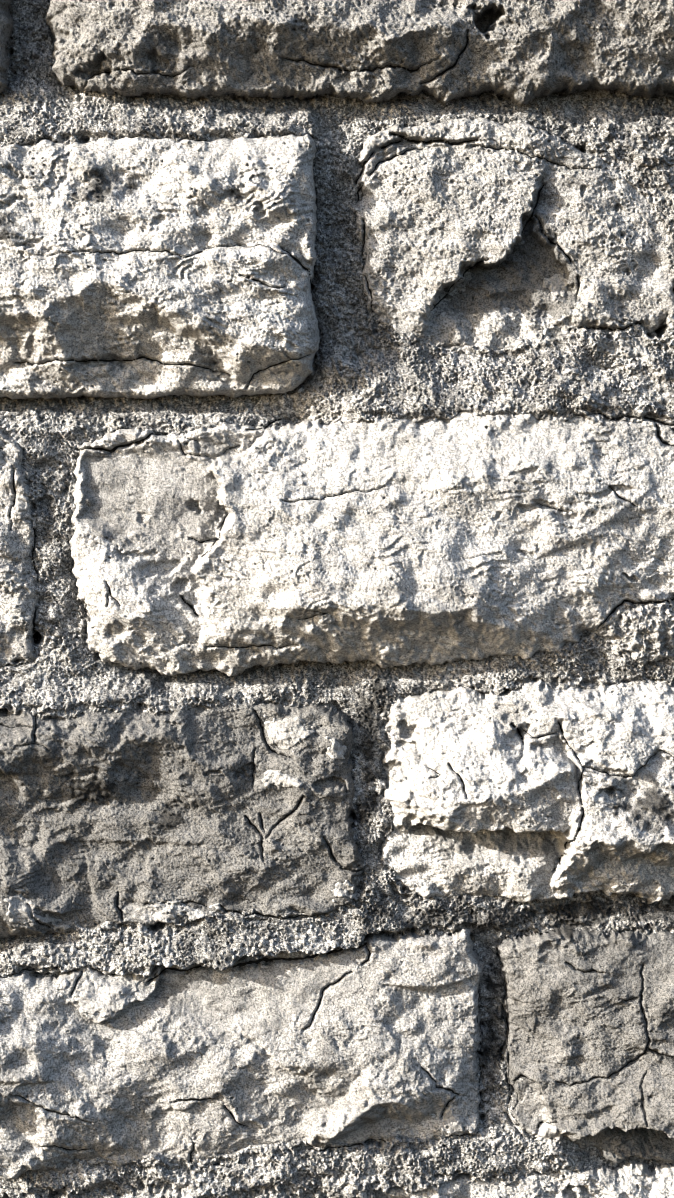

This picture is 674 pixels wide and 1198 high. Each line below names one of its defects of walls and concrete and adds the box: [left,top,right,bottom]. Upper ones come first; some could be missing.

crack [355,134,641,331]
crack [246,711,304,858]
crack [511,723,674,870]
crack [422,965,674,1138]